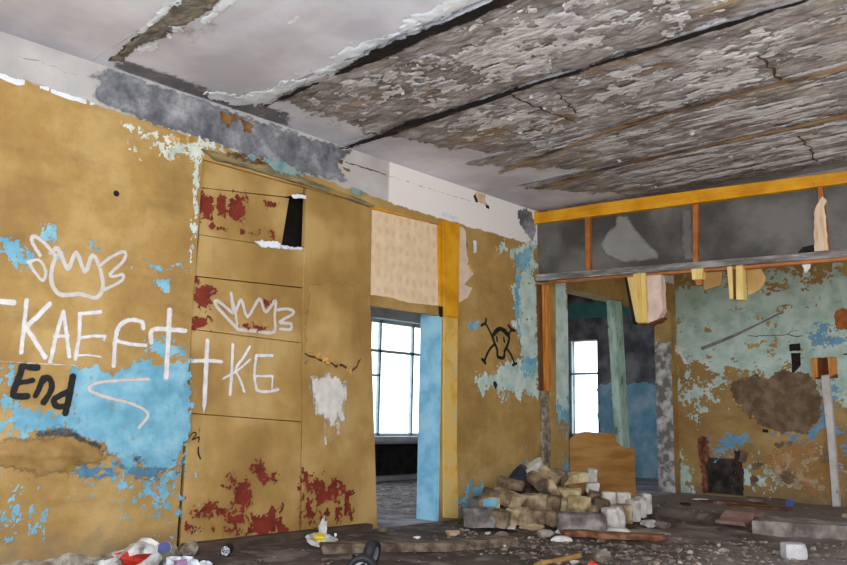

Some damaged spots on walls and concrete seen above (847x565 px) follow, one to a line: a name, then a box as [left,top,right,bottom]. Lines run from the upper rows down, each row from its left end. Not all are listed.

spalling [108,0,237,62]
peeling [203,0,847,197]
peeling [0,236,35,271]
peeling [37,220,57,243]
peeling [0,332,289,546]
peeling [474,236,569,472]
peeling [596,382,615,435]
corrosion [697,435,711,493]
peeling [626,262,847,498]
peeling [297,467,355,529]
peeling [457,472,496,519]
peeling [242,548,313,562]